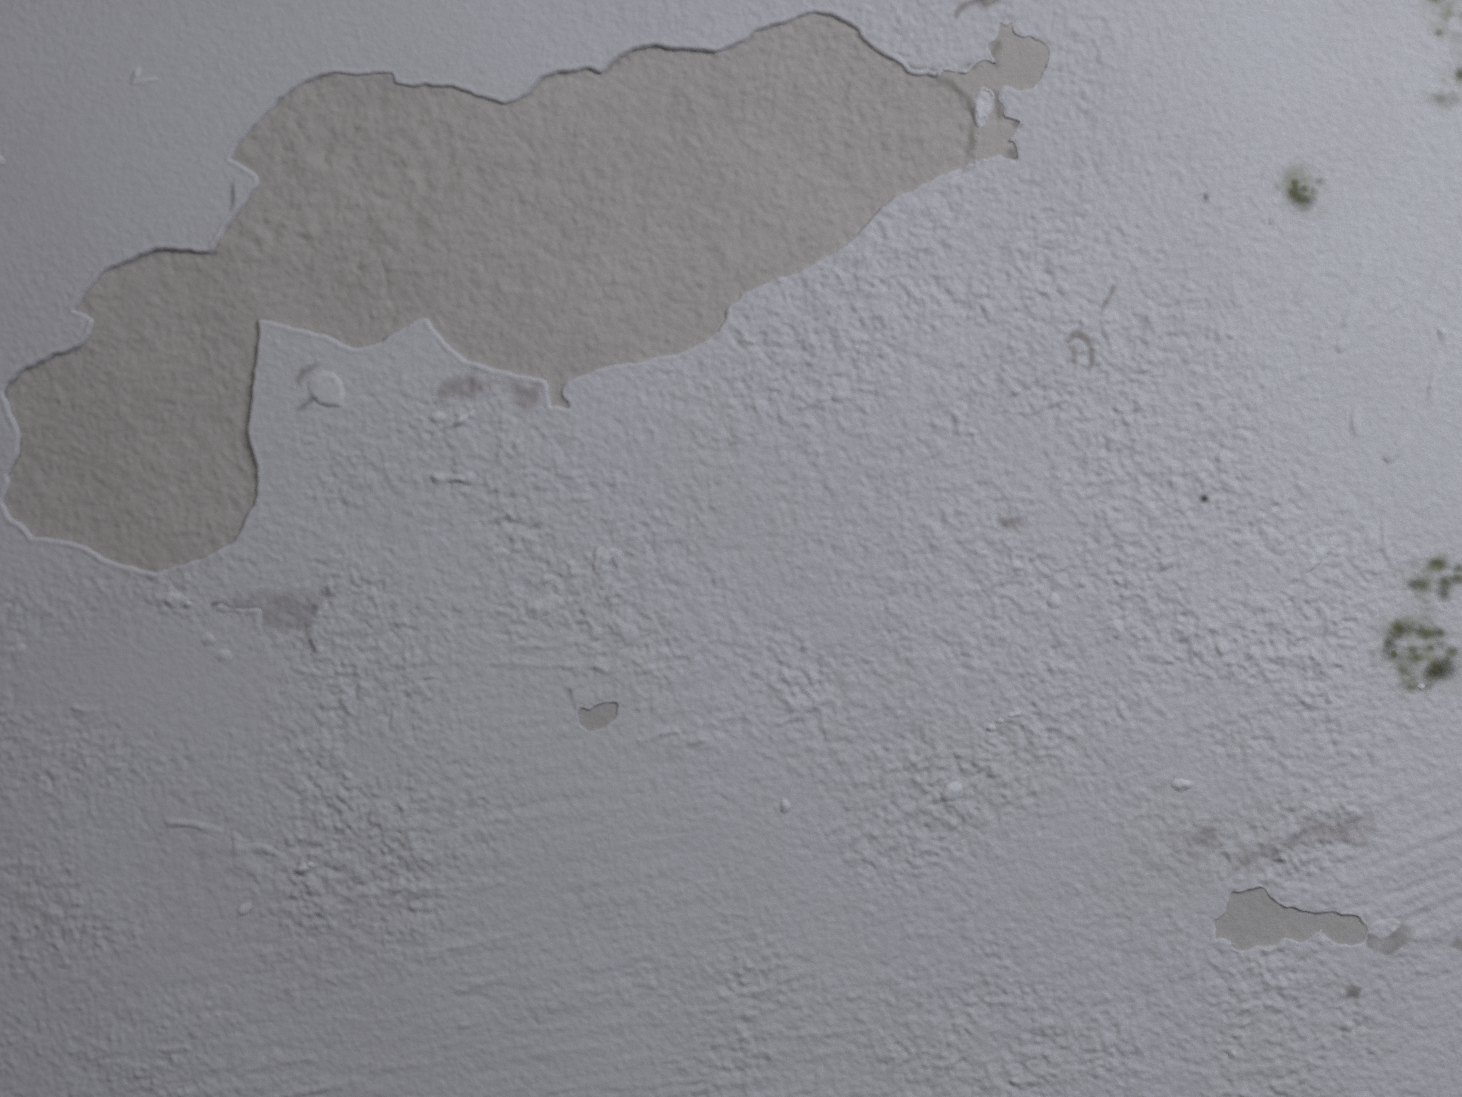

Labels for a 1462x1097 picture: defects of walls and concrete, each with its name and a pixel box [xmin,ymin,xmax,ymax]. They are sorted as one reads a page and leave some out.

peeling [0,0,1052,579]
water stain [1432,561,1461,592]
water stain [1388,625,1442,657]
peeling [574,699,621,734]
peeling [1211,884,1401,954]